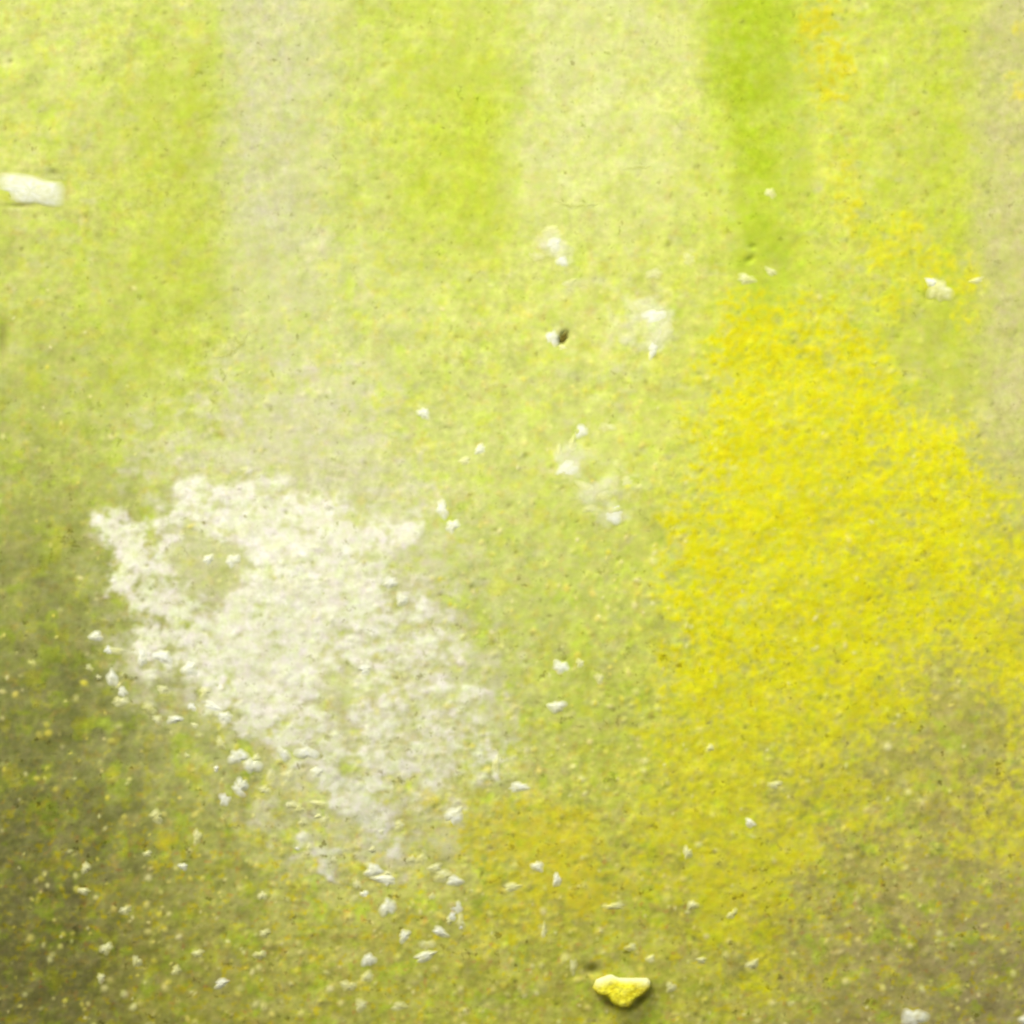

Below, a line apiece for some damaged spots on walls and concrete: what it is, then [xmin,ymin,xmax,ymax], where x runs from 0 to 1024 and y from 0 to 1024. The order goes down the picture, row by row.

leakage [70,0,555,918]
leakage [252,928,272,960]
leakage [398,900,466,964]
leakage [213,977,231,990]
leakage [339,952,378,1013]
leakage [390,1001,409,1012]